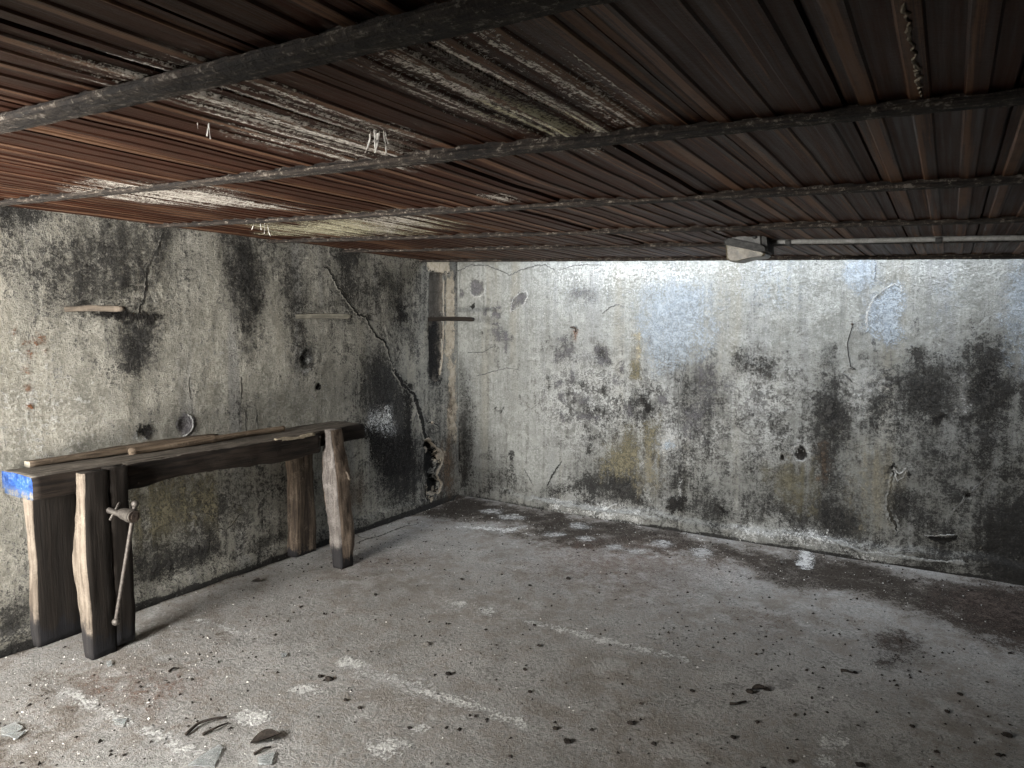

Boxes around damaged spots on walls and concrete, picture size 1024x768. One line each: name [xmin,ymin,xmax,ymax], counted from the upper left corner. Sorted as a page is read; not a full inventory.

leakage [0,206,177,408]
crack [137,234,163,365]
leakage [129,473,243,605]
leakage [64,178,462,514]
crack [322,265,427,442]
spalling [421,420,450,502]
leakage [540,333,689,515]
leakage [702,502,730,524]
leakage [681,347,776,445]
leakage [744,338,1024,584]
peeling [882,463,957,544]
leakage [0,602,31,658]